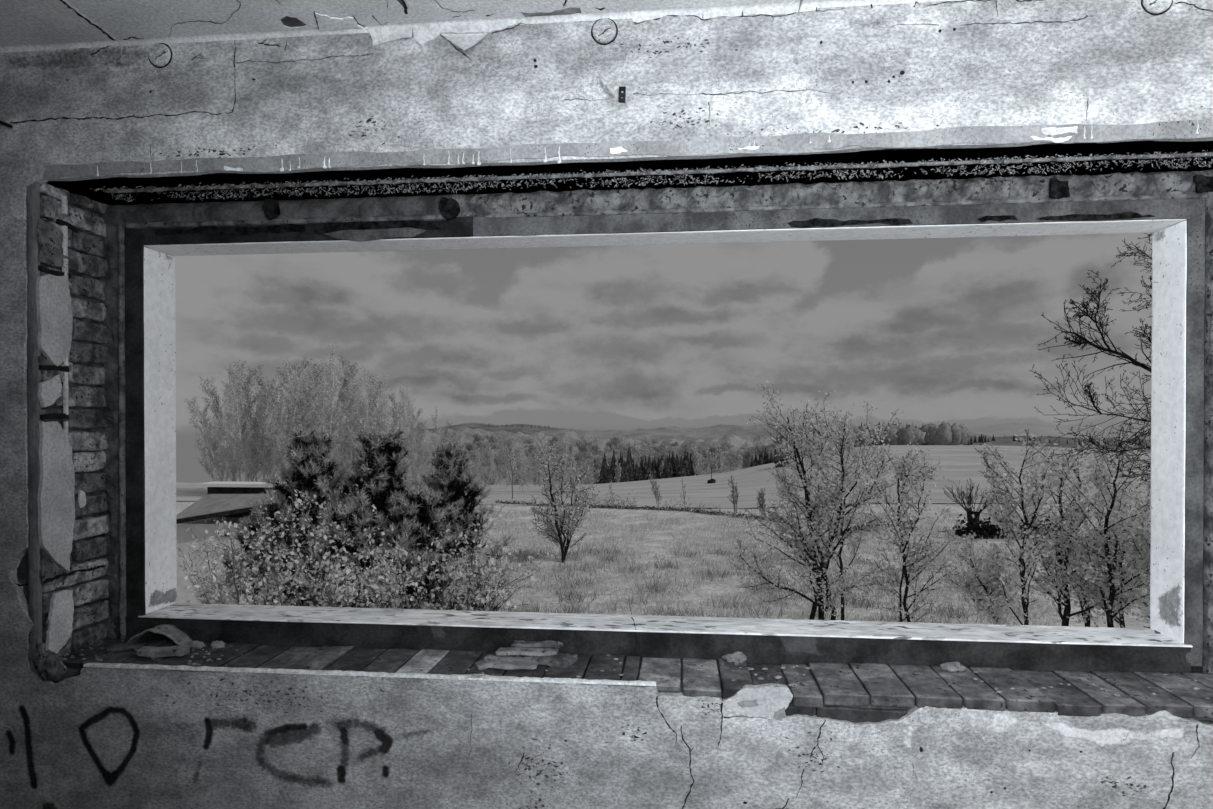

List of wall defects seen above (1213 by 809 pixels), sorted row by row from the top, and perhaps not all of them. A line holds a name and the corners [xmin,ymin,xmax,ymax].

crack [632,0,1088,27]
crack [10,0,523,158]
spalling [27,631,67,681]
peeling [689,695,758,715]
crack [656,696,770,809]
crack [775,720,826,809]
crack [1163,724,1200,809]